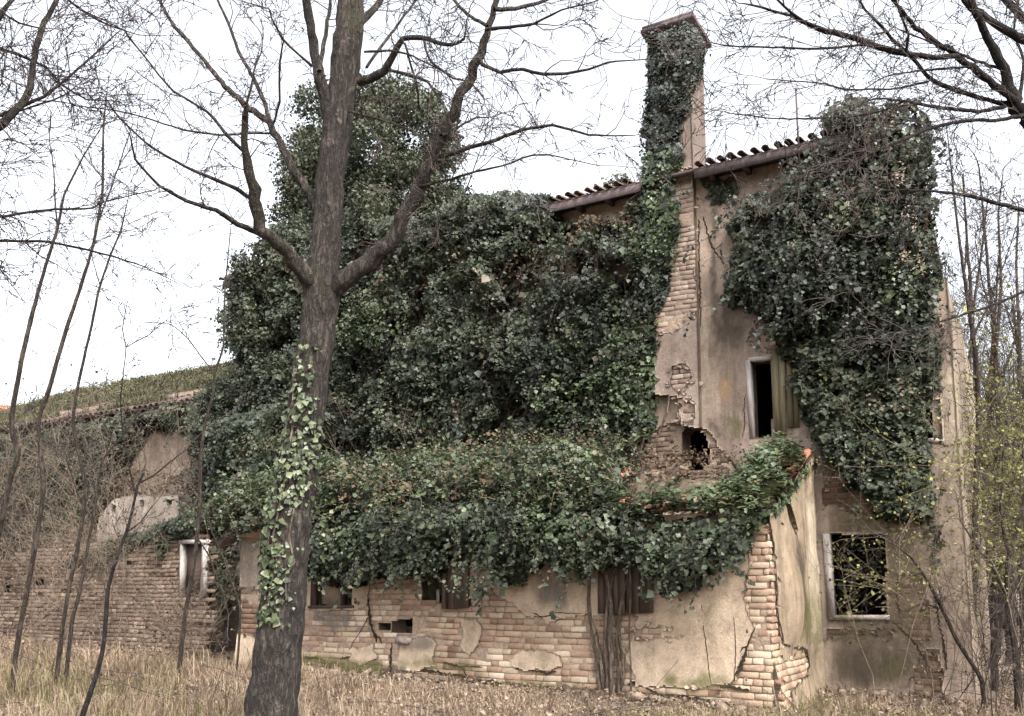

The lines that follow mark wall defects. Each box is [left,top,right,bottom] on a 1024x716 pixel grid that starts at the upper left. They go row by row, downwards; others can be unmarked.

flaking render [654,165,701,335]
flaking render [644,361,729,480]
crack [303,598,393,676]
flaking render [301,522,811,713]